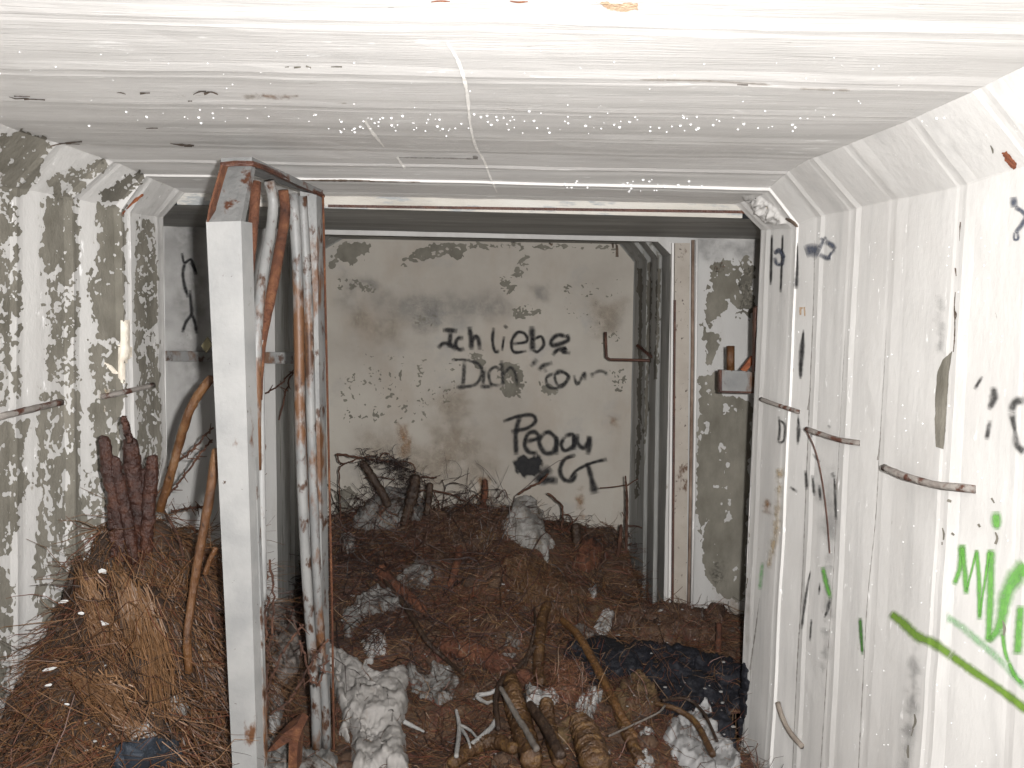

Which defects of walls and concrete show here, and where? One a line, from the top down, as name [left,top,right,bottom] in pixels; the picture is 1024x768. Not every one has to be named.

crack [302,43,497,193]
rust [207,165,228,222]
rust [1002,151,1017,170]
peeling [328,241,376,293]
peeling [401,241,616,294]
peeling [512,304,541,319]
peeling [0,128,163,698]
peeling [341,350,558,423]
peeling [695,255,800,605]
peeling [935,352,952,449]